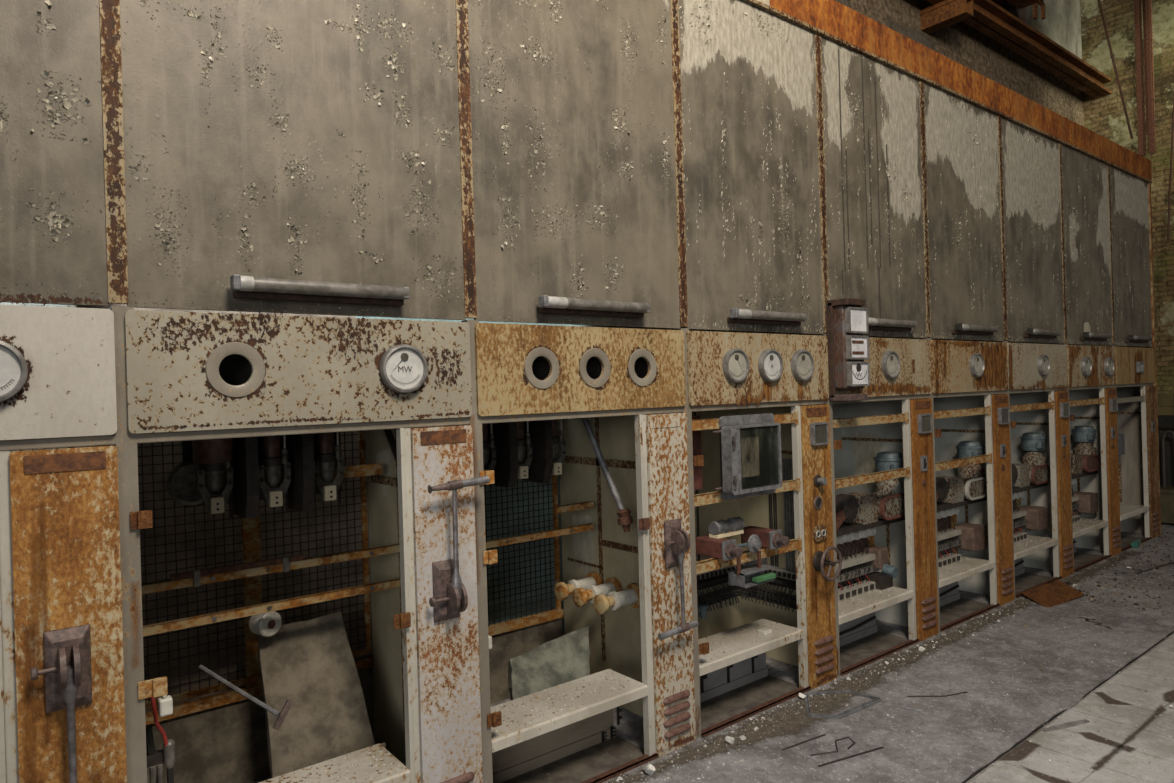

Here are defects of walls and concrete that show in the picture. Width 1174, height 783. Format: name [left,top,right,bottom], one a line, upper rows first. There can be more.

peeling [36,0,57,36]
peeling [27,69,91,145]
corrosion [0,0,127,306]
corrosion [457,0,476,314]
corrosion [817,36,828,328]
water stain [680,0,1080,319]
water stain [1095,164,1149,276]
corrosion [0,335,33,409]
corrosion [521,345,565,391]
corrosion [578,343,612,391]
corrosion [627,347,659,386]
corrosion [26,505,49,783]